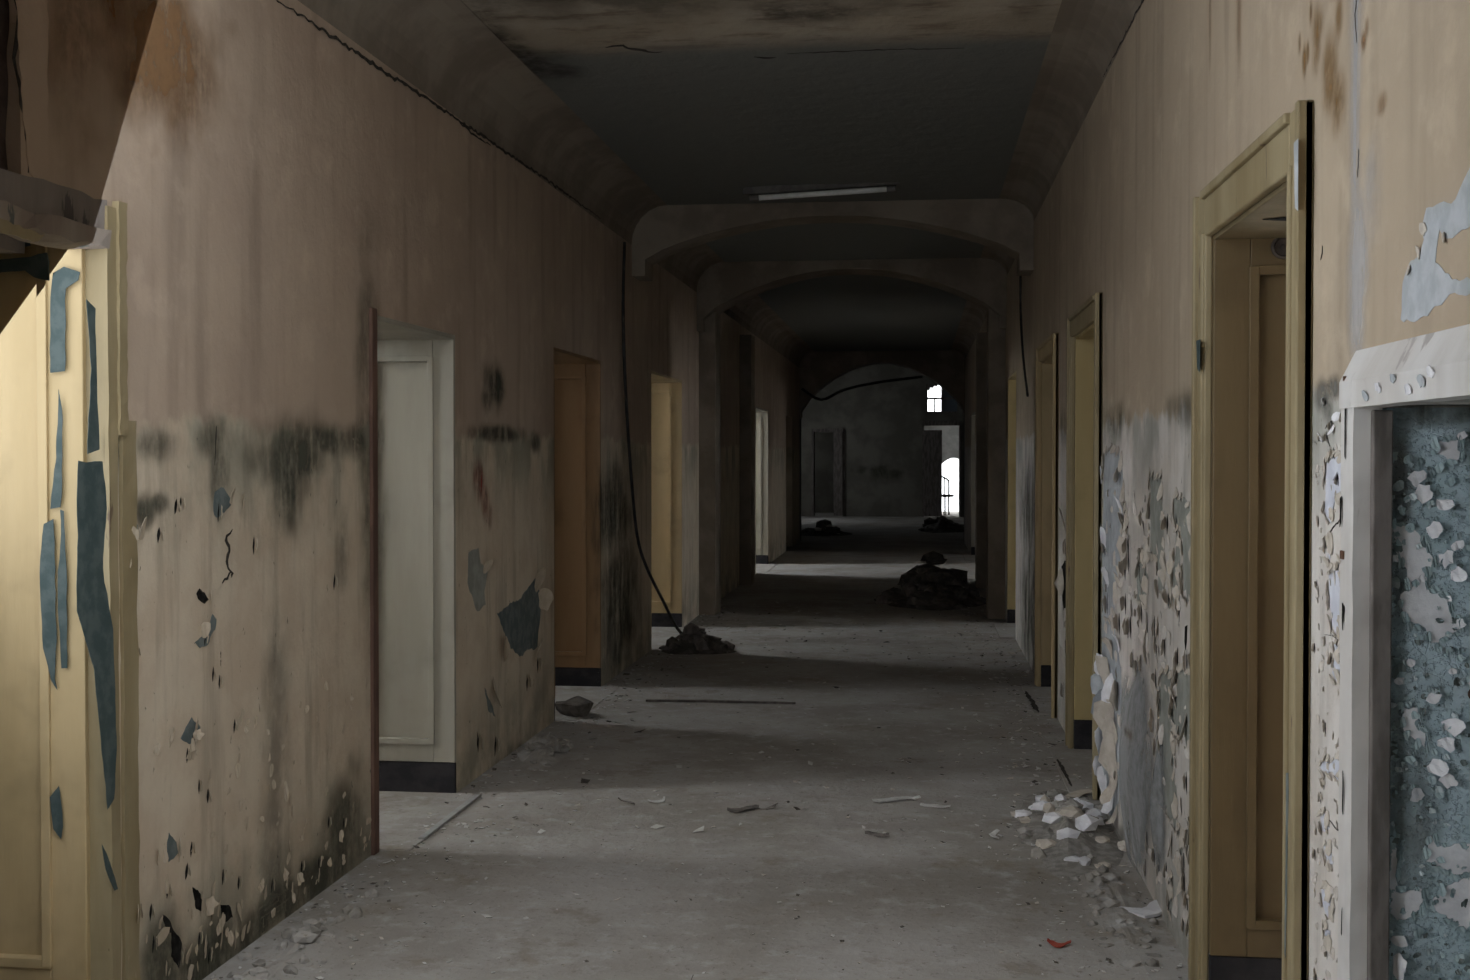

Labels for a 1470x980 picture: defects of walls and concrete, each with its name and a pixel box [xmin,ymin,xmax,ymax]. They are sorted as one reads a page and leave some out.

flaking render [1401,168,1470,322]
peeling [1090,443,1191,937]
peeling [1311,712,1339,980]
peeling [1389,431,1470,980]